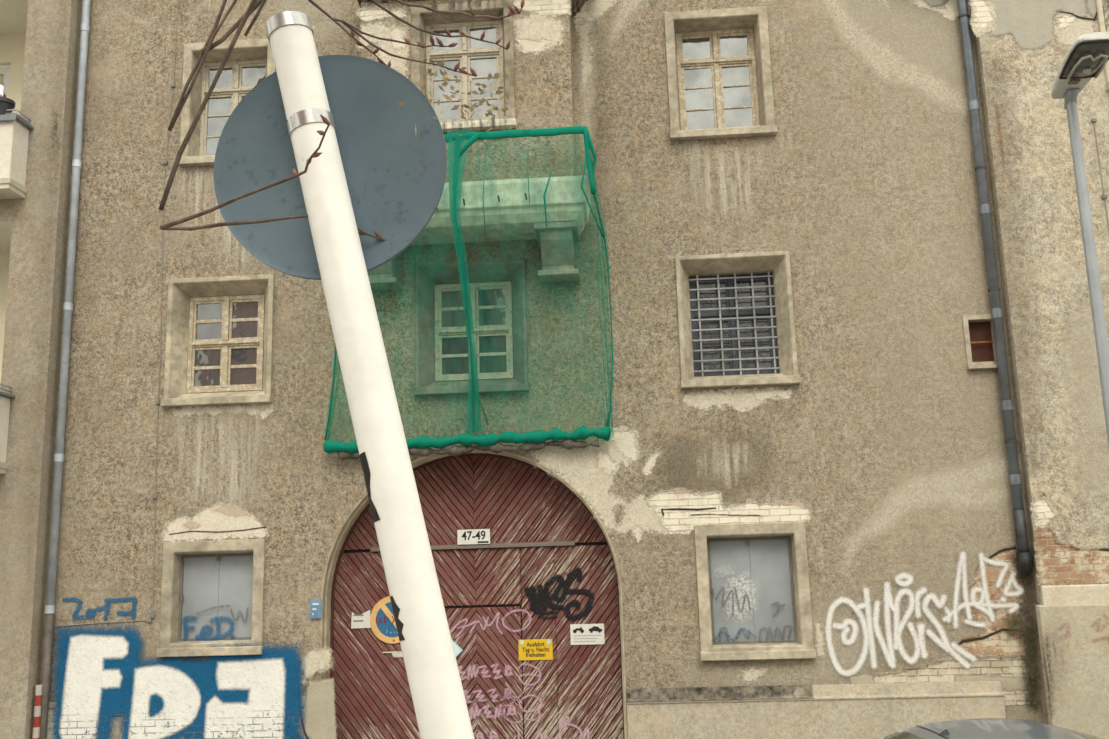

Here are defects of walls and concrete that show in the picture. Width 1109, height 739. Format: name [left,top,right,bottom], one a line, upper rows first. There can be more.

flaking render [356,6,409,79]
flaking render [513,0,618,95]
flaking render [909,0,1104,51]
flaking render [681,385,796,413]
flaking render [525,425,812,543]
flaking render [161,502,270,542]
flaking render [850,492,1109,707]